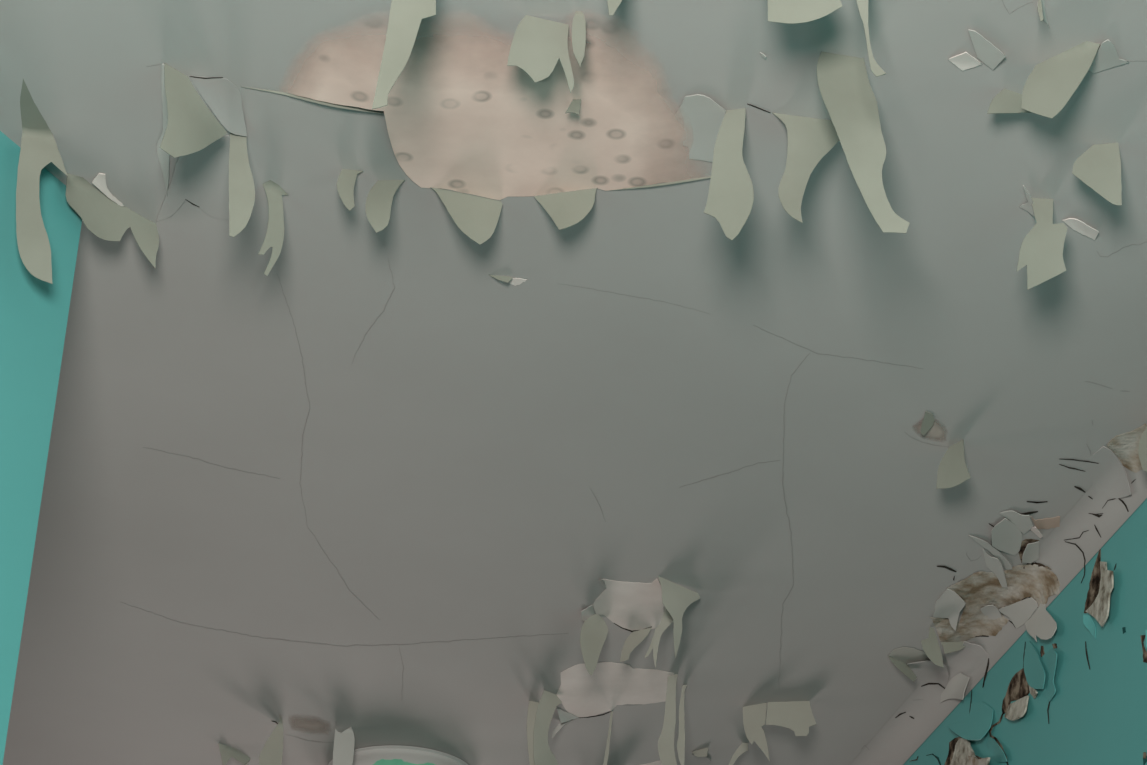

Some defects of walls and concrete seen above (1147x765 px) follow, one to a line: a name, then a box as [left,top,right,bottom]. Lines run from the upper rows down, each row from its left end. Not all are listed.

peeling [987,40,1147,119]
peeling [16,0,910,284]
peeling [1072,143,1122,206]
peeling [1017,185,1099,290]
crack [143,274,376,617]
crack [680,325,922,681]
crack [121,602,568,689]
peeling [527,576,700,765]
peeling [888,501,1060,765]
flaking render [1083,549,1116,670]
peeling [218,714,355,765]
peeling [729,701,816,765]